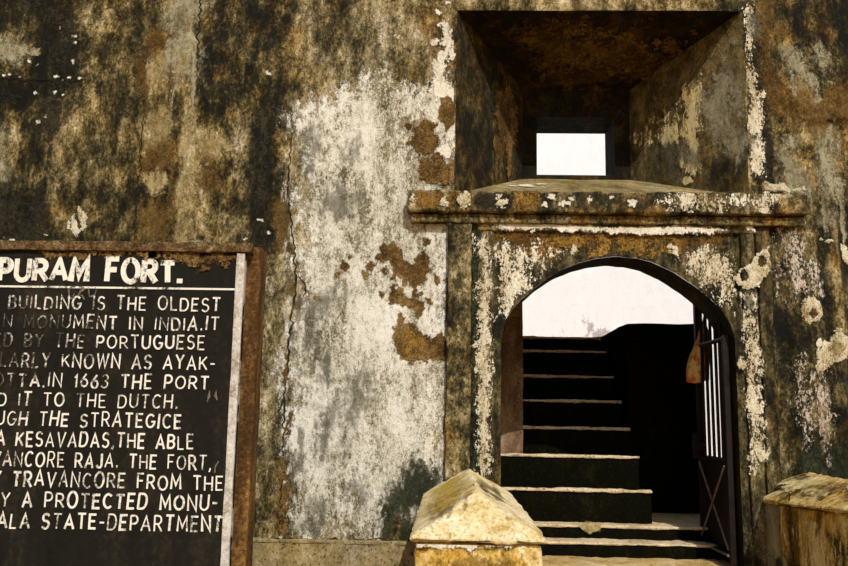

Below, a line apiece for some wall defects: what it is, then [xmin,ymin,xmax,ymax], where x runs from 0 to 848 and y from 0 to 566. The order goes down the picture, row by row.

damp [0,0,90,241]
damp [145,0,215,196]
crack [278,106,307,459]
crack [269,479,410,541]
peeling [257,1,471,540]
damp [374,228,481,541]
spalling [541,194,574,208]
damp [493,231,728,267]
peeling [472,217,824,476]
peeling [629,3,807,214]
damp [654,0,848,336]
peeling [790,328,848,467]